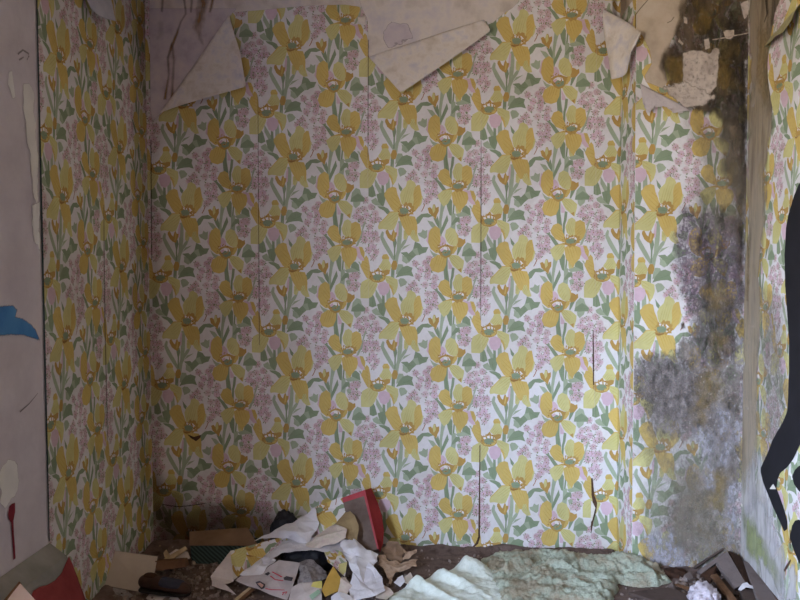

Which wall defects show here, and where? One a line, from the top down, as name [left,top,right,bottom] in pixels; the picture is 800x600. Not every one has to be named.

flaking render [149,0,361,121]
flaking render [620,0,749,107]
leakage [634,0,797,600]